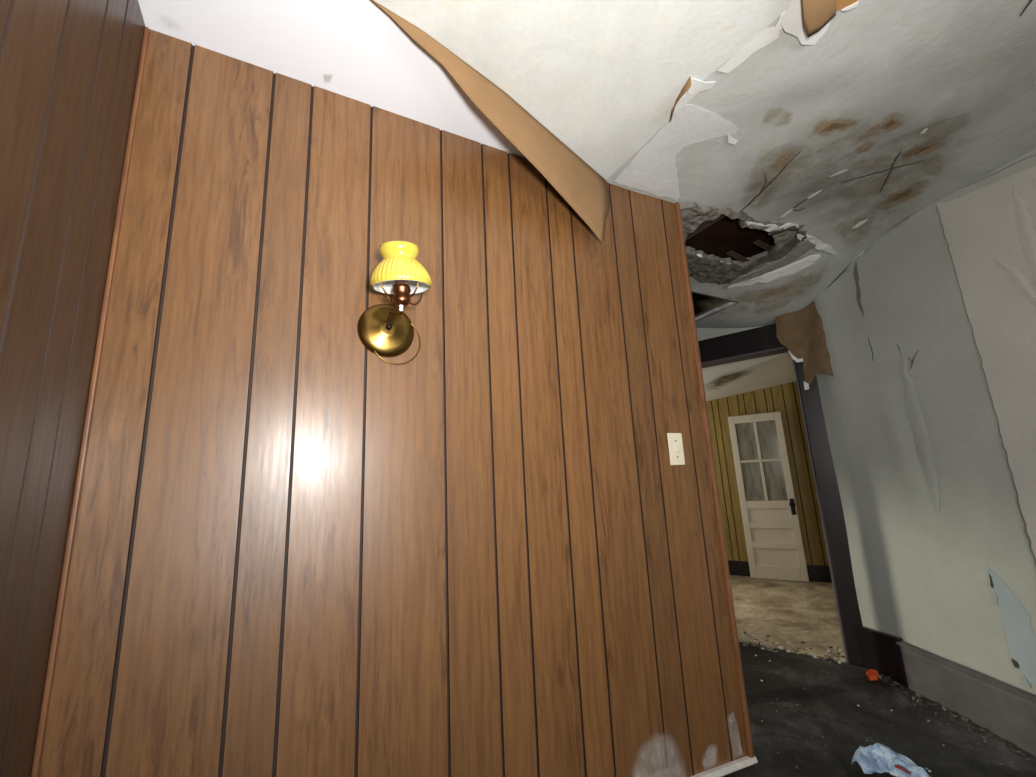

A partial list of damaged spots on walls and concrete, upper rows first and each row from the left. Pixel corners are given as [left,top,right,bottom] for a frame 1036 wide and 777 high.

water stain [816,116,900,152]
crack [936,205,1036,566]
peeling [987,567,1036,688]
water stain [704,749,715,766]